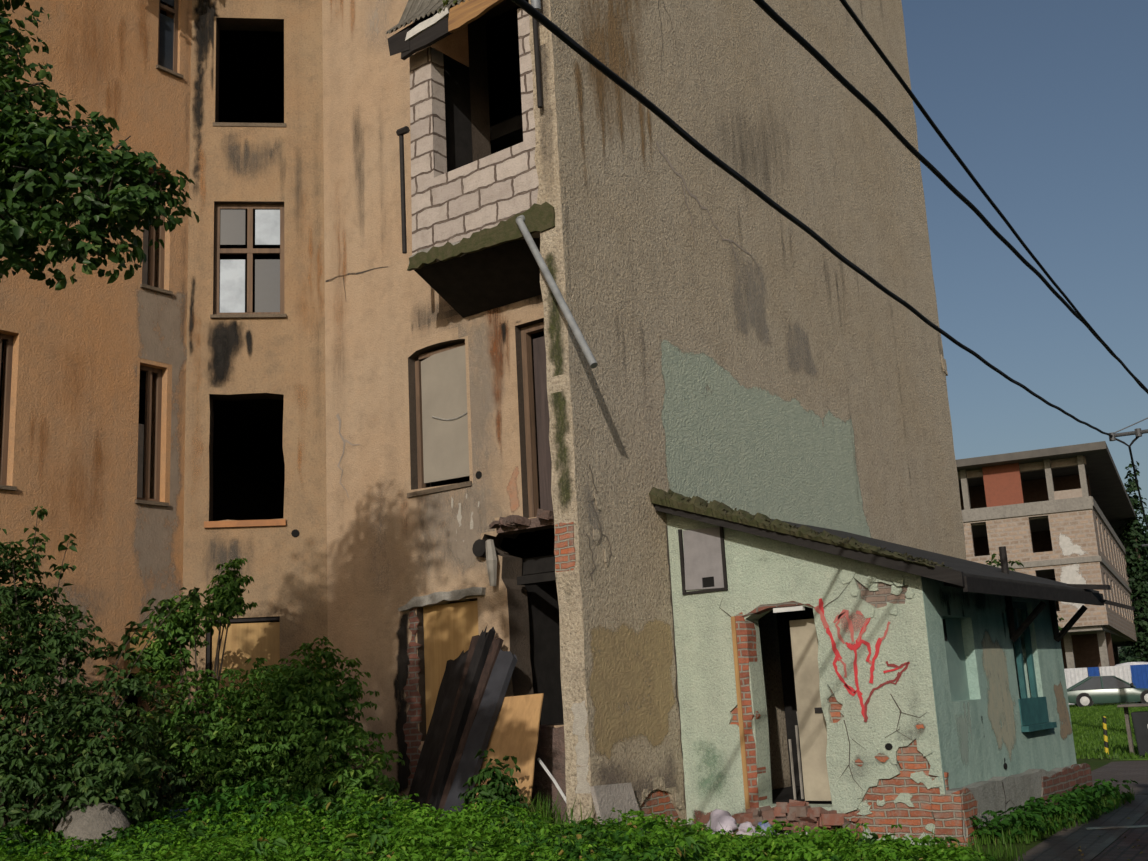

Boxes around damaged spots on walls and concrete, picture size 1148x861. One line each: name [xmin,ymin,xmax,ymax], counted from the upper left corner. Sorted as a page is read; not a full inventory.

water stain [204,0,217,54]
water stain [575,0,637,153]
water stain [214,321,252,379]
flaking render [838,568,915,618]
flaking render [730,706,739,726]
crack [841,694,927,790]
flaking render [640,781,682,826]
flaking render [842,723,980,847]